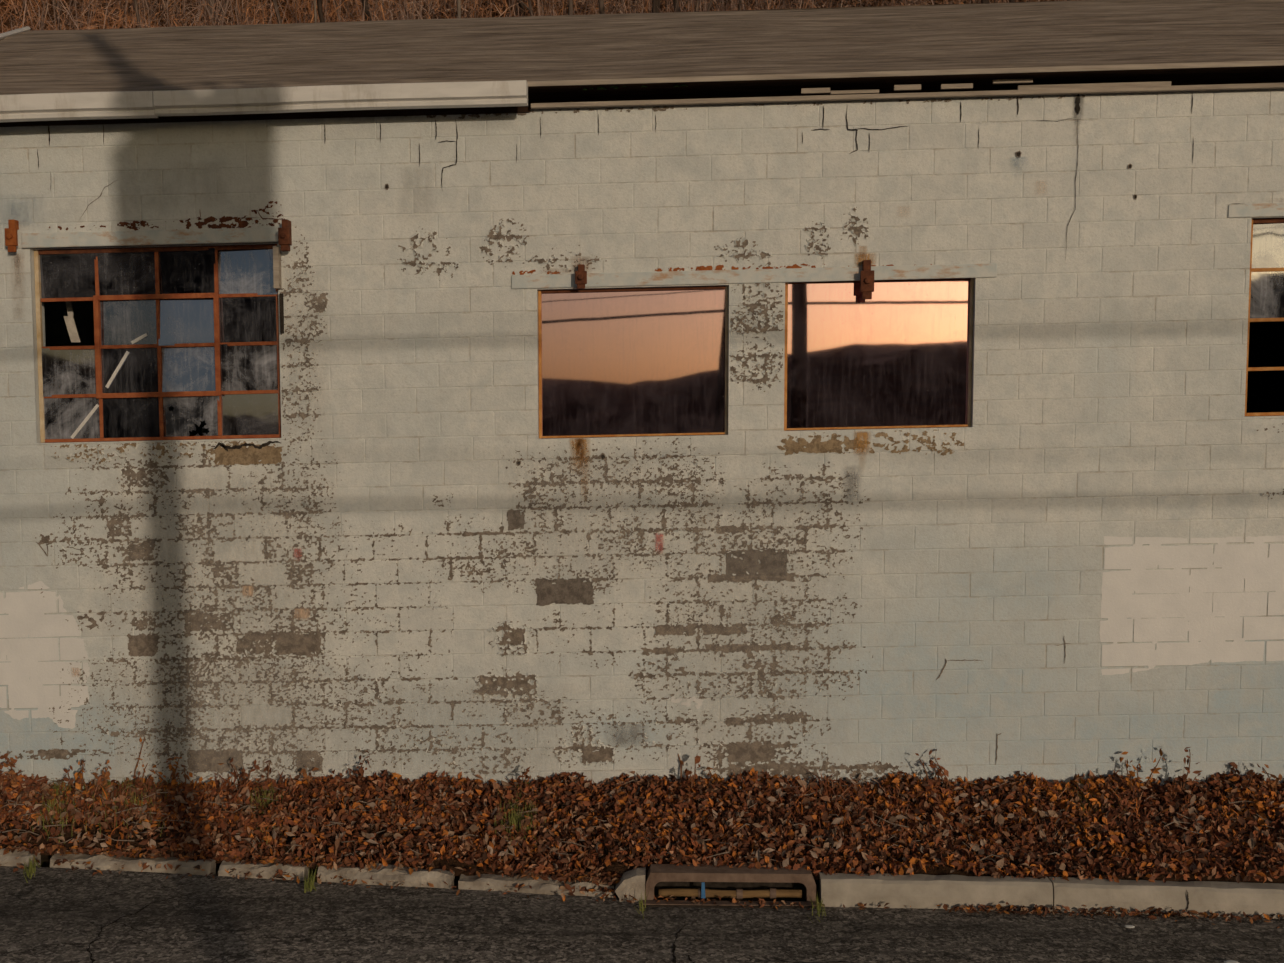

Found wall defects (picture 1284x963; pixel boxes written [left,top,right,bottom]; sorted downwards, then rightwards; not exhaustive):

crack [419,119,458,184]
crack [802,106,909,153]
crack [1017,94,1080,260]
peeling [7,201,964,786]
crack [87,893,196,963]
crack [672,922,685,963]